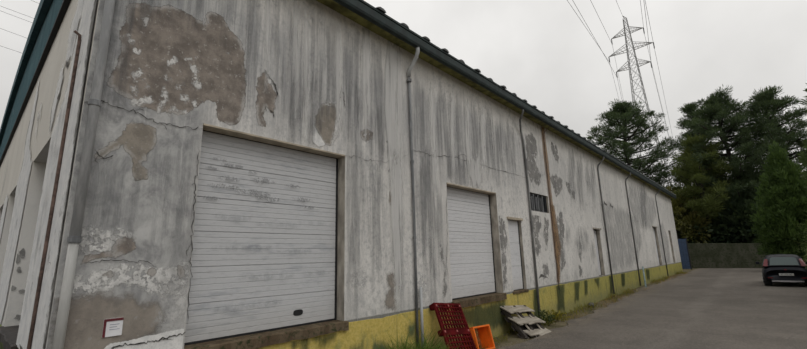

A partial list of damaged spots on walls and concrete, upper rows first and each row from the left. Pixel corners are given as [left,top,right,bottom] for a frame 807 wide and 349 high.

peeling [0,0,97,349]
peeling [94,122,157,181]
crack [84,100,199,130]
peeling [107,3,246,125]
peeling [256,72,277,127]
peeling [312,99,343,147]
water stain [385,42,403,295]
water stain [465,102,485,188]
peeling [525,134,575,199]
peeling [64,224,190,349]
crack [112,153,199,349]
peeling [532,212,566,271]